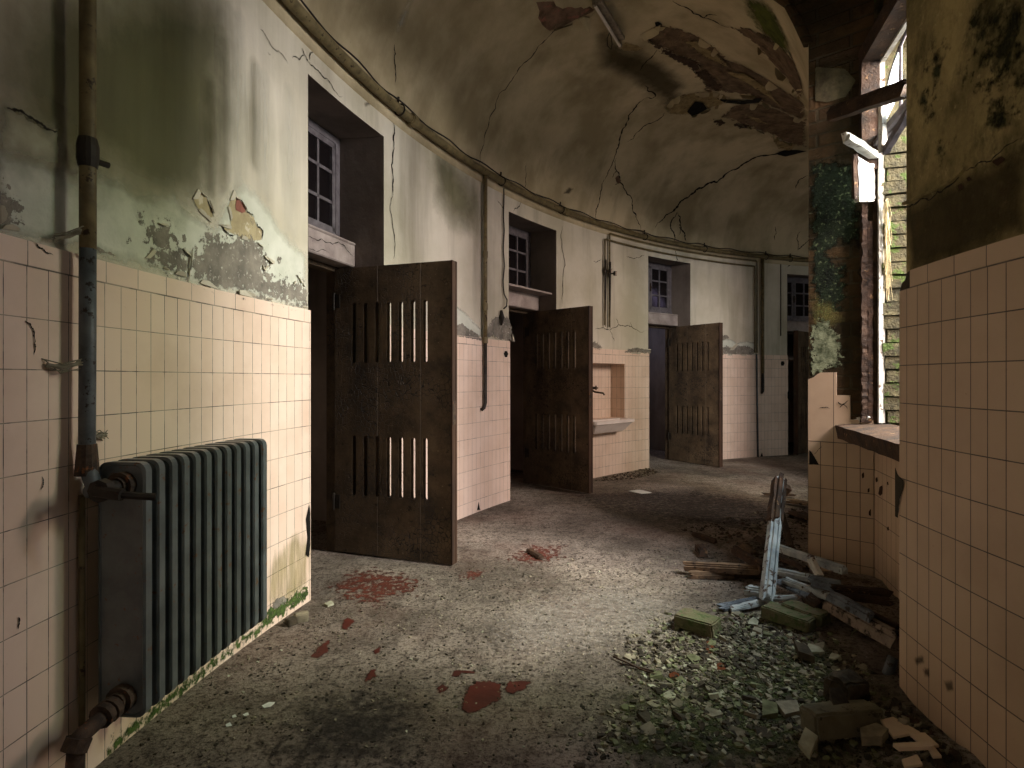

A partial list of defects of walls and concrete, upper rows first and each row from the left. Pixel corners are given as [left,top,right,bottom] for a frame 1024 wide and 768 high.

spalling [536,0,611,31]
peeling [0,177,25,231]
crack [7,107,61,133]
crack [262,24,340,97]
crack [595,50,777,264]
spalling [640,25,807,151]
leakage [918,45,947,119]
crack [902,139,1018,207]
leakage [963,0,1024,129]
peeling [126,189,309,308]